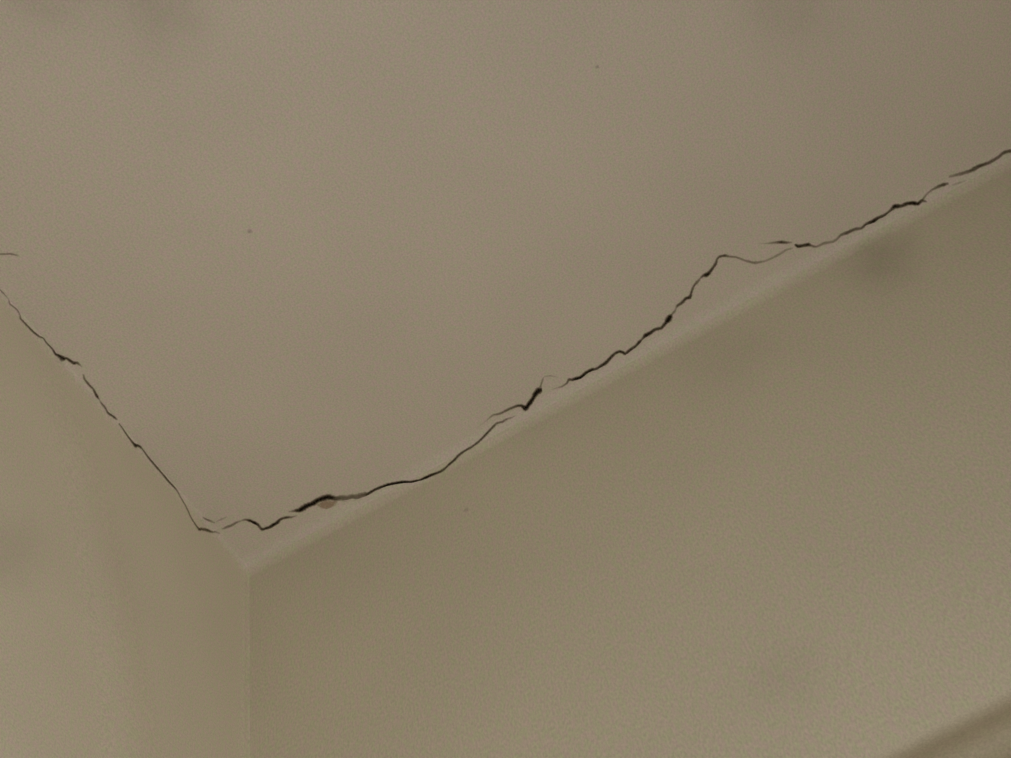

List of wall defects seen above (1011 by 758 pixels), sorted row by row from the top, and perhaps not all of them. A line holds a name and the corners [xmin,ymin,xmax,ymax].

crack [777,240,814,248]
crack [842,150,1011,235]
crack [566,255,729,384]
crack [20,318,176,489]
crack [245,388,542,531]